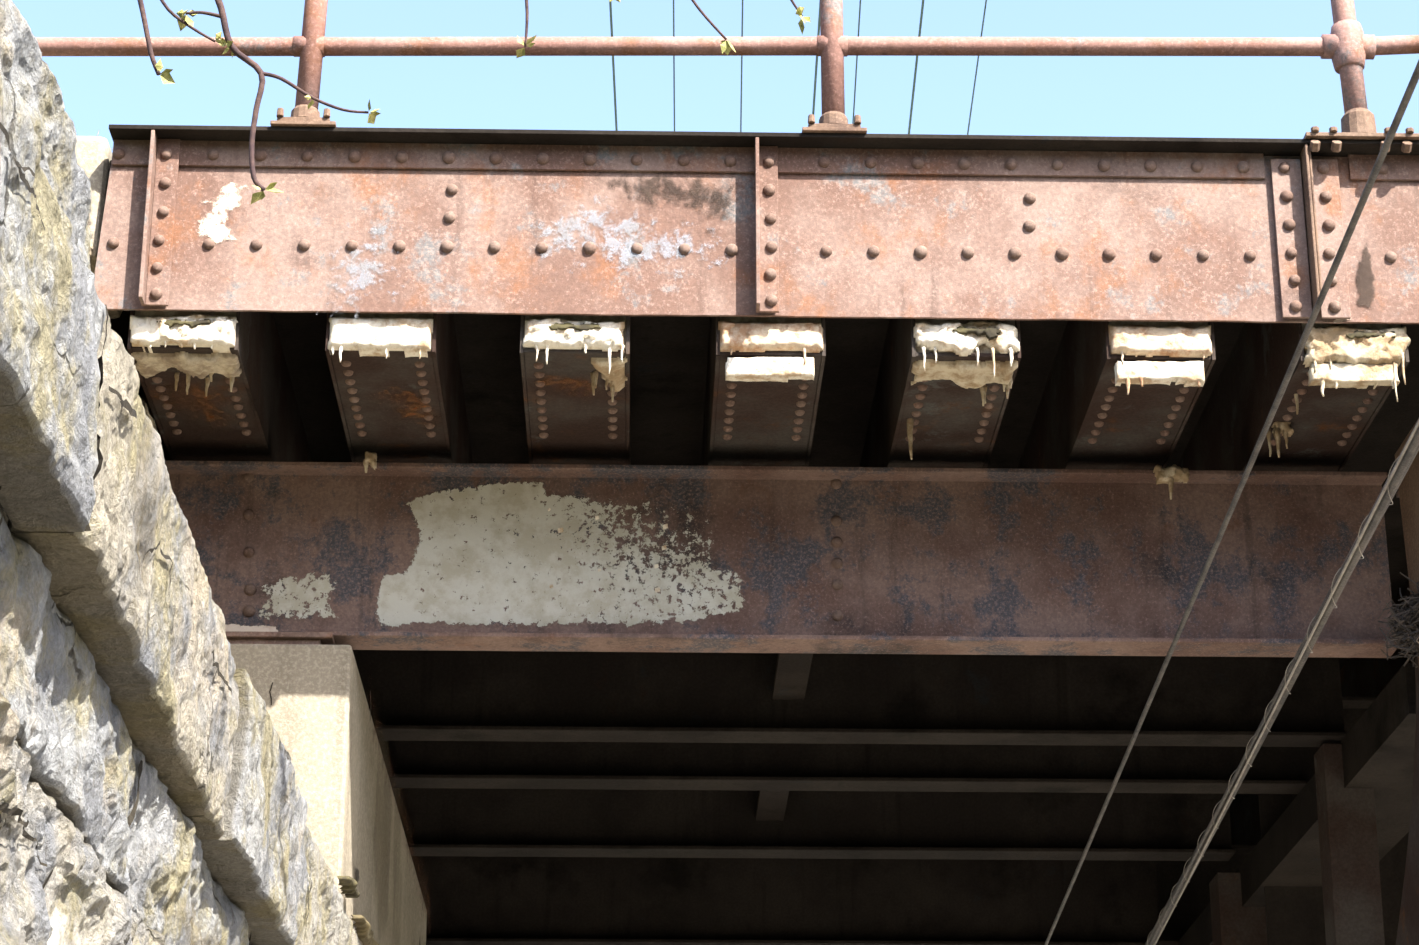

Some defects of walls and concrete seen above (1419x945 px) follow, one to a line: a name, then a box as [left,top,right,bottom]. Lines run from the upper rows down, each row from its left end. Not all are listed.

crack [0,122,45,230]
corrosion [608,175,732,217]
corrosion [1356,247,1375,308]
leakage [523,317,627,402]
leakage [718,321,823,382]
leakage [911,320,1020,406]
peeling [375,482,745,627]
peeling [225,572,338,632]